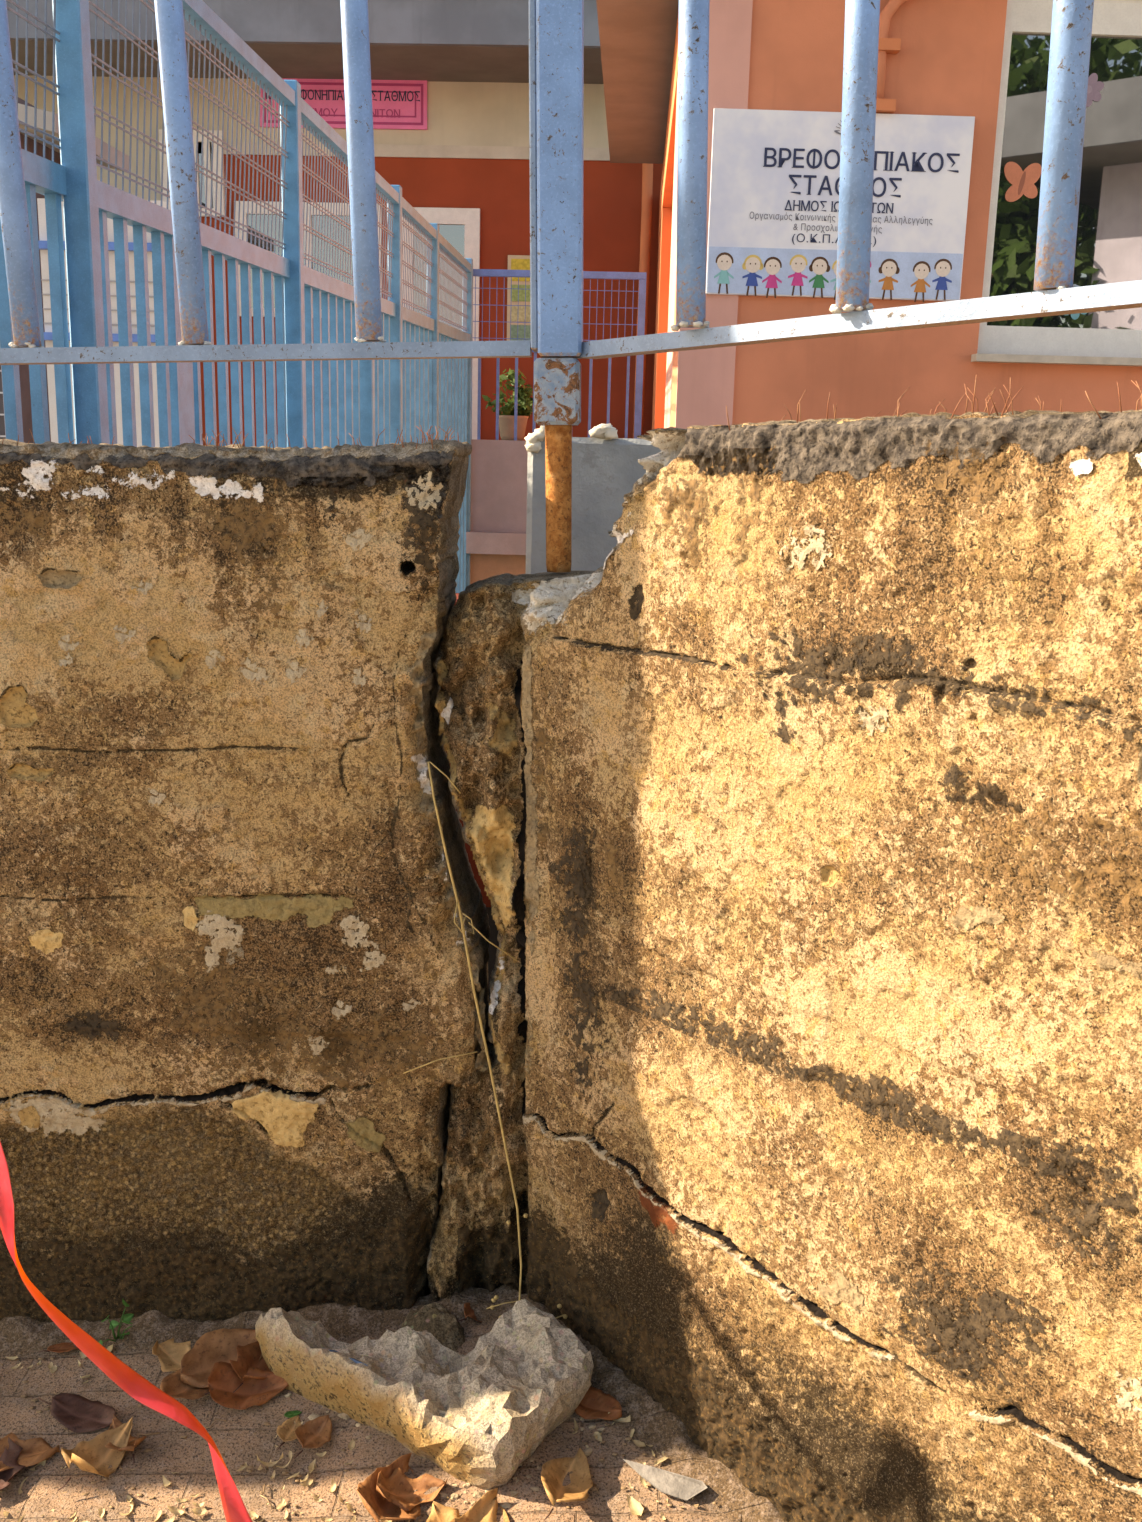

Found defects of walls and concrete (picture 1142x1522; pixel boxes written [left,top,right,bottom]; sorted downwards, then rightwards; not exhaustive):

water stain [0,450,455,630]
spalling [512,431,686,635]
crack [553,637,742,673]
crack [0,1079,371,1133]
crack [381,1144,412,1201]
crack [511,660,1142,1497]
water stain [0,1196,432,1323]
water stain [456,1173,932,1522]
water stain [866,1247,1073,1407]